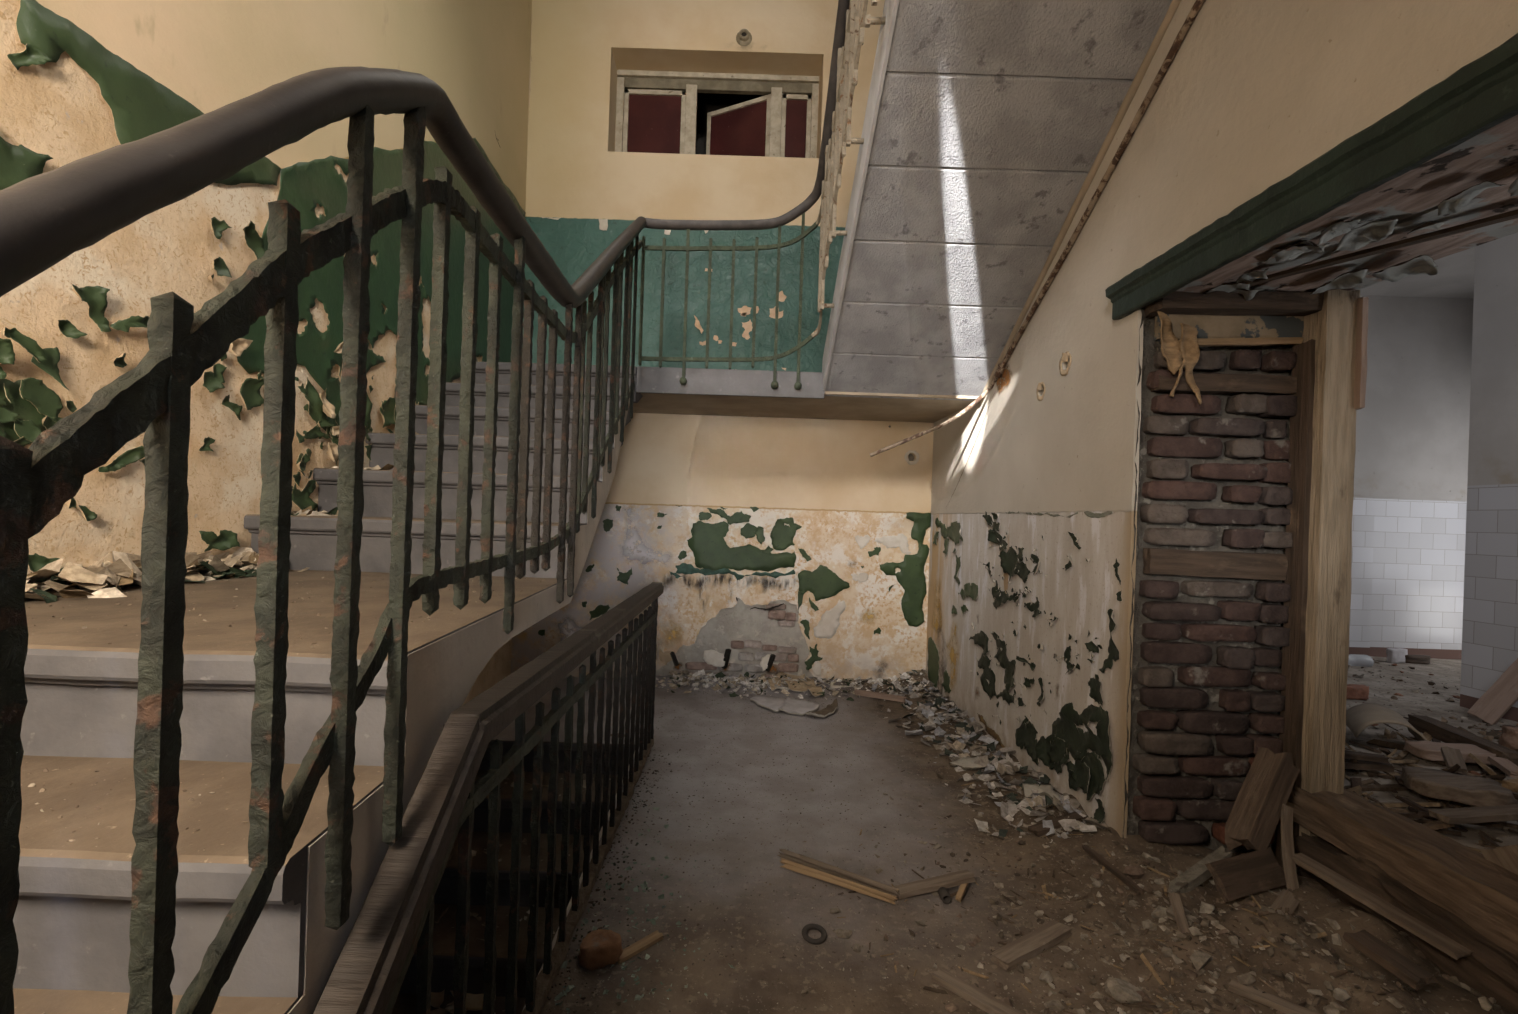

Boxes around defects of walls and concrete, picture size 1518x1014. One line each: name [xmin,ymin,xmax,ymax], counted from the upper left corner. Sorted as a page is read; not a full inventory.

peeling [7,0,204,145]
peeling [0,137,53,190]
peeling [0,283,149,447]
peeling [207,257,232,283]
peeling [203,316,267,420]
peeling [211,217,269,259]
peeling [214,155,349,232]
peeling [292,255,344,510]
peeling [364,219,402,461]
peeling [416,141,515,405]
peeling [199,530,241,552]
flaking render [656,308,1297,856]